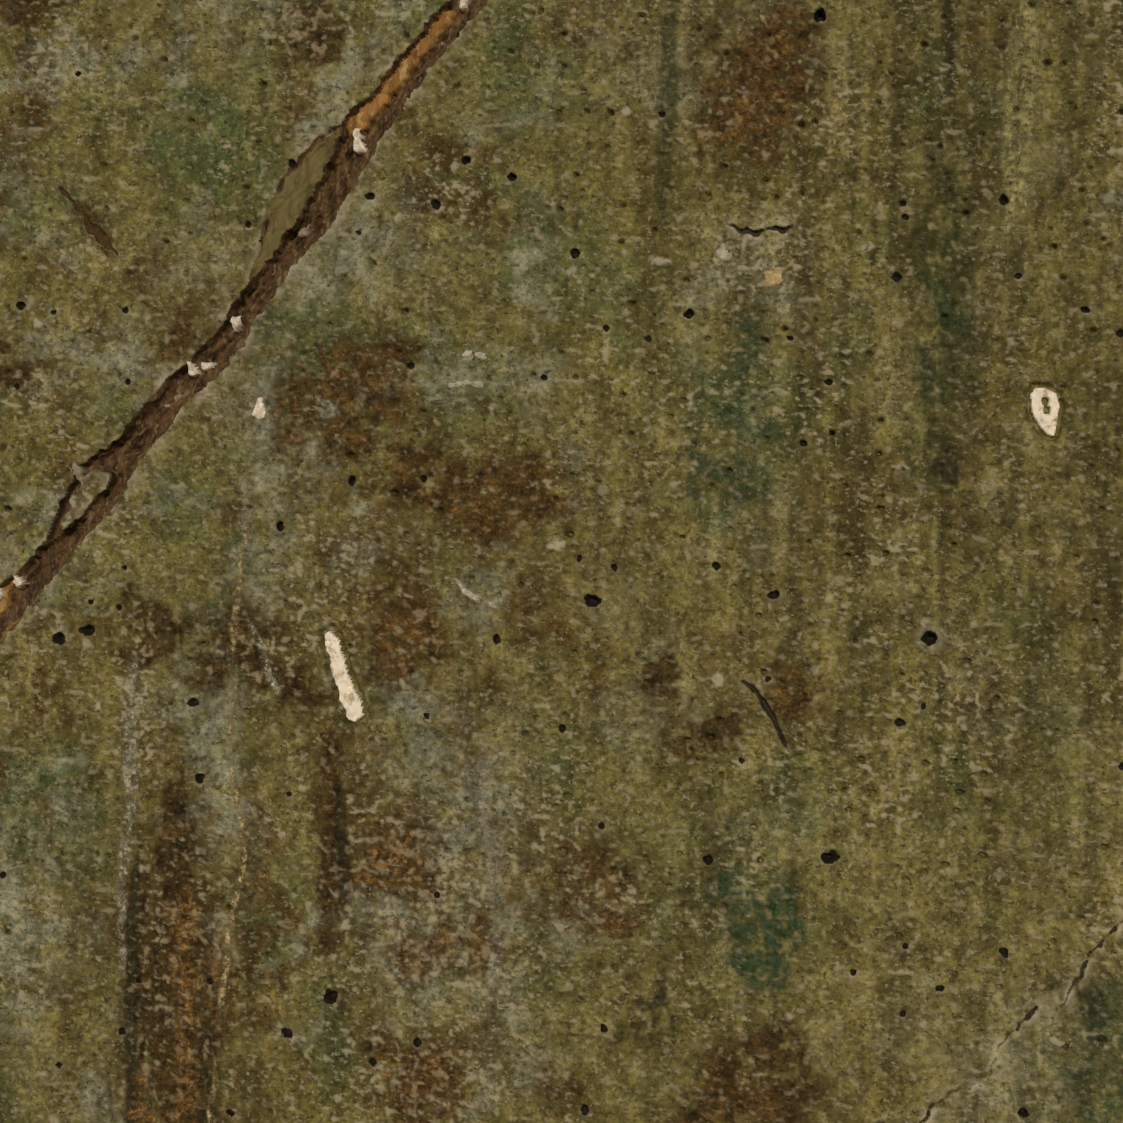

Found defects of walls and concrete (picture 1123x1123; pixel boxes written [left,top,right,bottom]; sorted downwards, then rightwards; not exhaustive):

corrosion [693,6,821,164]
crack [0,0,487,643]
crack [741,680,787,747]
corrosion [121,775,222,1123]